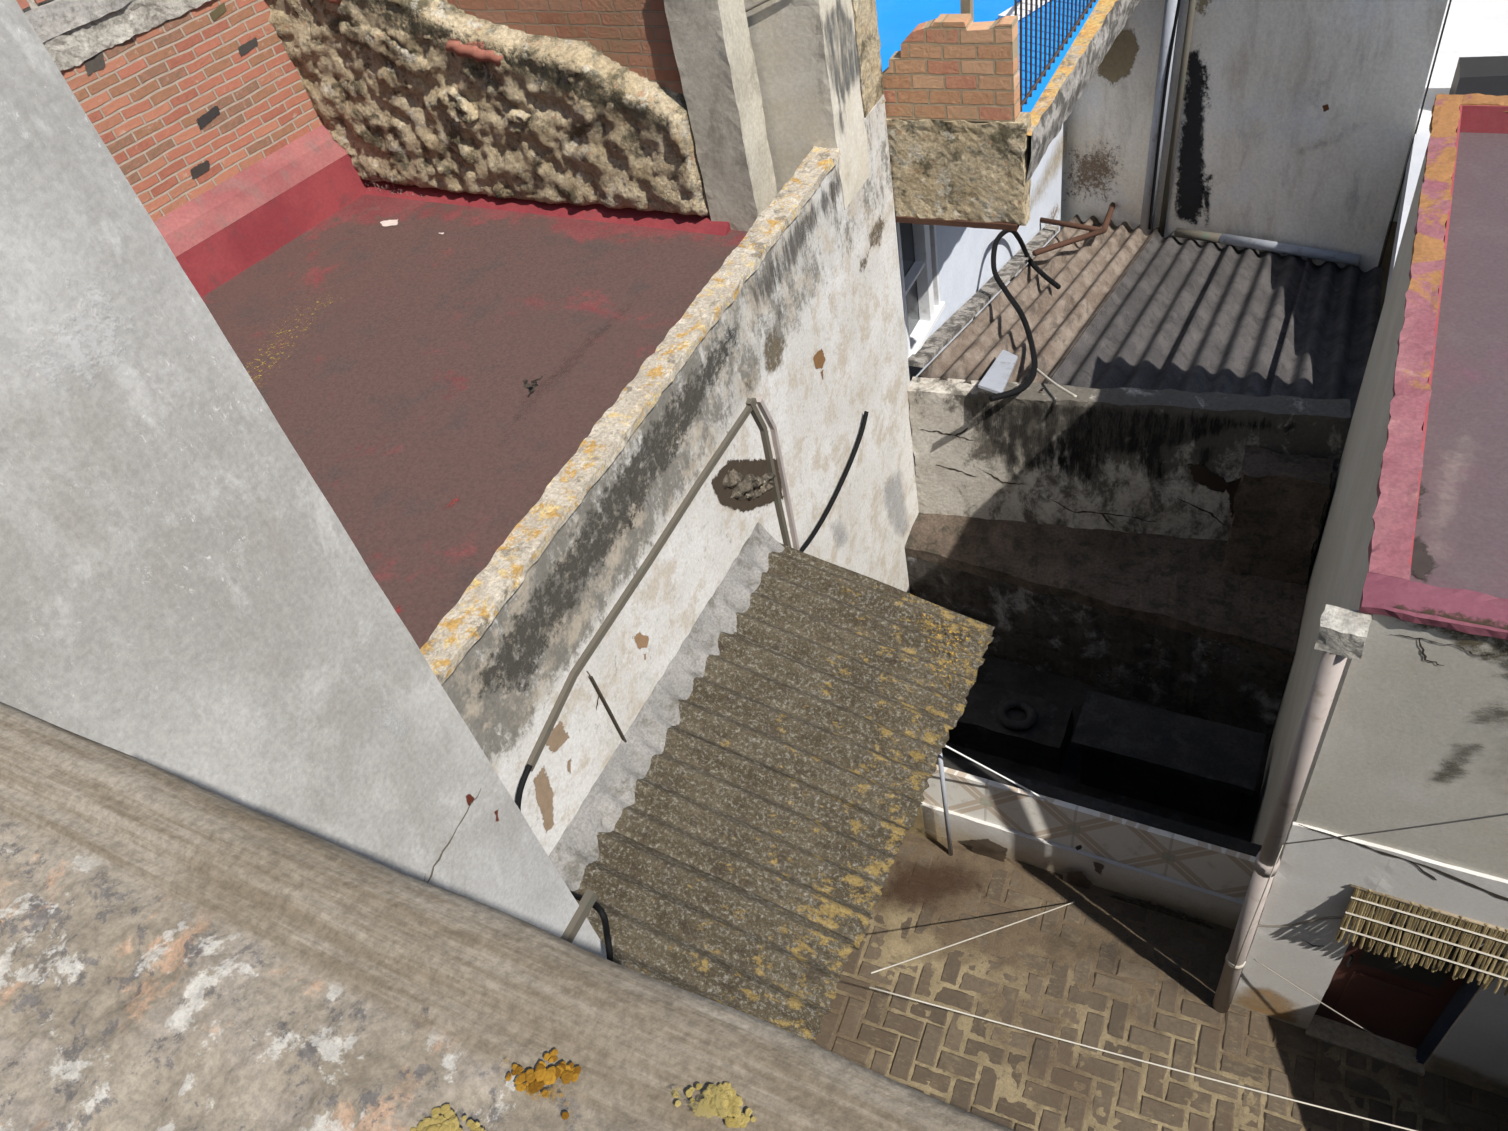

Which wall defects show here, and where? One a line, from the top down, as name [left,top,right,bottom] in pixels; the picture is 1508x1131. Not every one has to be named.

mould [822,0,860,132]
water stain [1175,50,1213,225]
water stain [1038,139,1122,226]
mould [477,327,737,698]
spalling [711,458,784,513]
water stain [977,402,1295,486]
water stain [1395,605,1508,676]
peeling [534,721,571,832]
water stain [1436,745,1481,783]
crack [1298,824,1508,901]